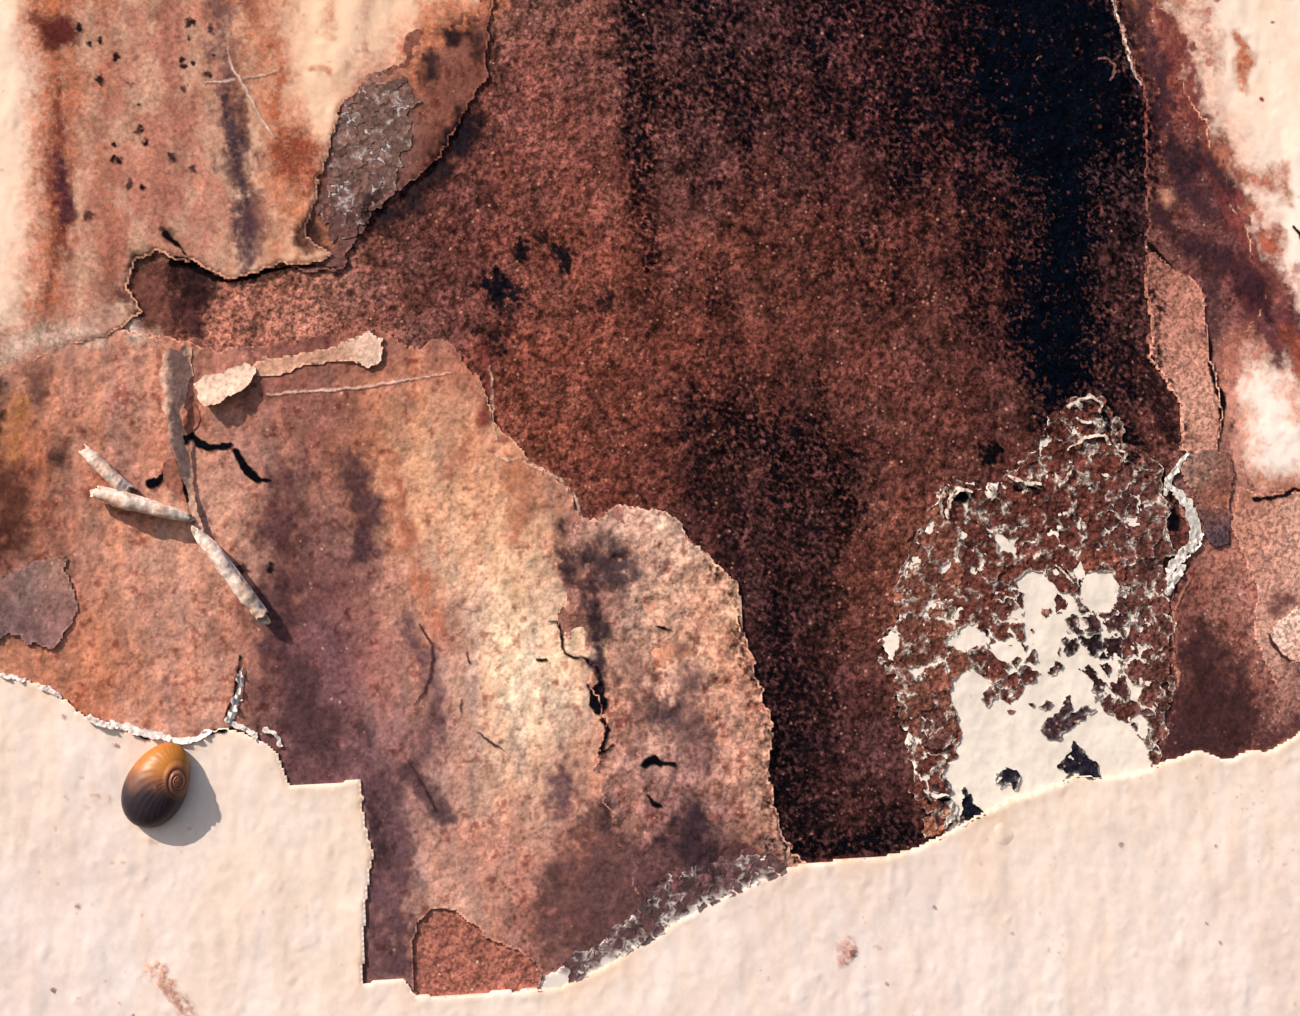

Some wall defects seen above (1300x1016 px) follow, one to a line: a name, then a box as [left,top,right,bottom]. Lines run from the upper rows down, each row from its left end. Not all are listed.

rust [357,0,508,86]
crack [162,230,336,283]
rust [1155,0,1300,506]
rust [475,347,498,427]
peeling [79,346,277,628]
peeling [944,486,973,519]
crack [1252,487,1300,502]
crack [536,621,603,687]
peeling [85,714,212,745]
crack [597,718,615,755]
peeling [537,849,785,991]
rust [146,962,192,1014]